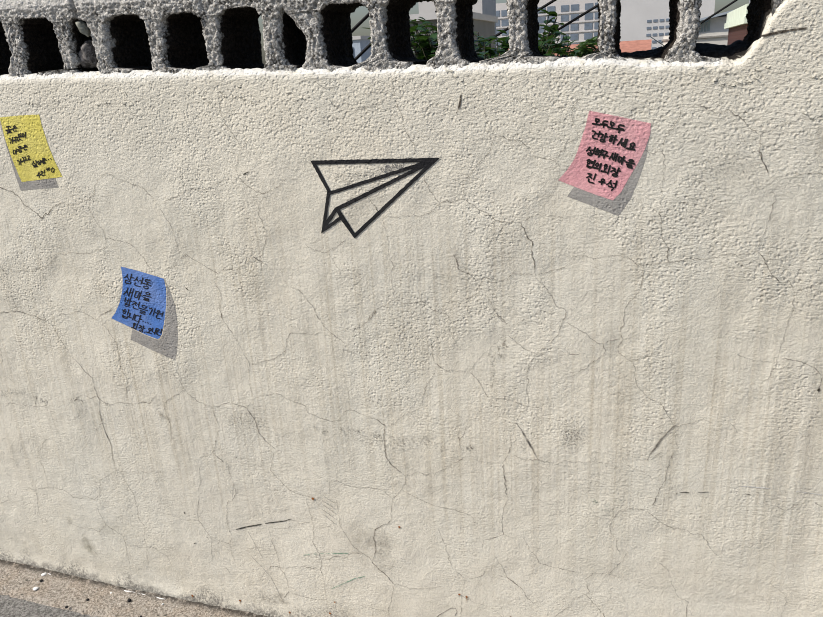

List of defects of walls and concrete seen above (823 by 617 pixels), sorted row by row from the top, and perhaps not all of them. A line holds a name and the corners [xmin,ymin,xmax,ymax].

crack [162,182,278,332]
crack [364,136,644,439]
crack [659,214,779,282]
crack [61,353,198,553]
crack [199,345,462,612]